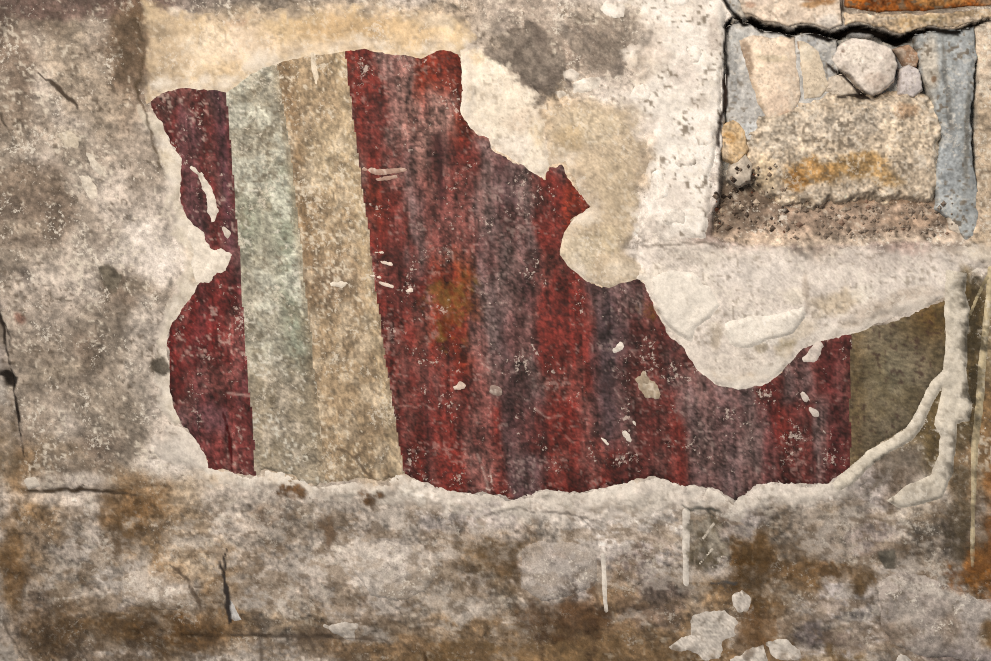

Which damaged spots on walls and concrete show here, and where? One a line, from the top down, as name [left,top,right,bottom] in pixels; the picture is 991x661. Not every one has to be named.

crack [716,0,991,147]
peeling [484,0,991,390]
water stain [962,303,987,353]
crack [0,314,23,451]
peeling [800,392,819,417]
water stain [963,367,980,402]
crack [27,486,135,495]
water stain [325,517,337,549]
crack [219,549,388,642]